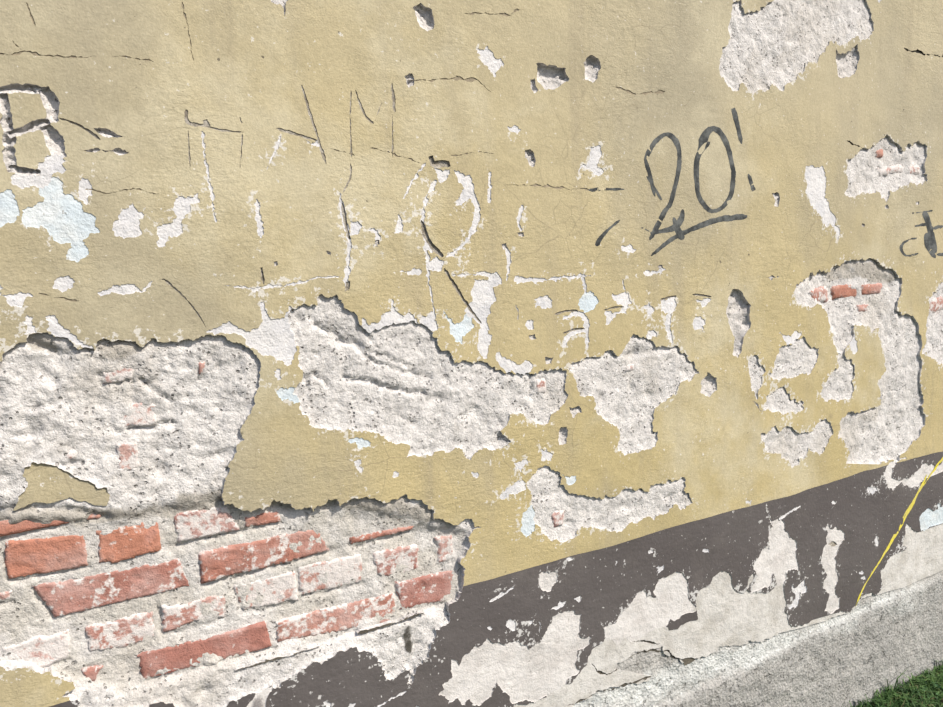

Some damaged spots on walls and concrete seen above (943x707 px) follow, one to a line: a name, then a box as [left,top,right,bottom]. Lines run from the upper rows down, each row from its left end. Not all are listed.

crack [0,40,151,61]
crack [181,2,194,60]
spalling [719,0,880,94]
peeling [0,173,100,262]
peeling [112,203,144,239]
peeling [805,165,840,239]
spalling [844,134,928,209]
spalling [726,258,943,494]
spalling [0,271,717,707]
peeling [750,506,807,609]
peeling [821,525,845,614]
peeling [919,503,943,531]